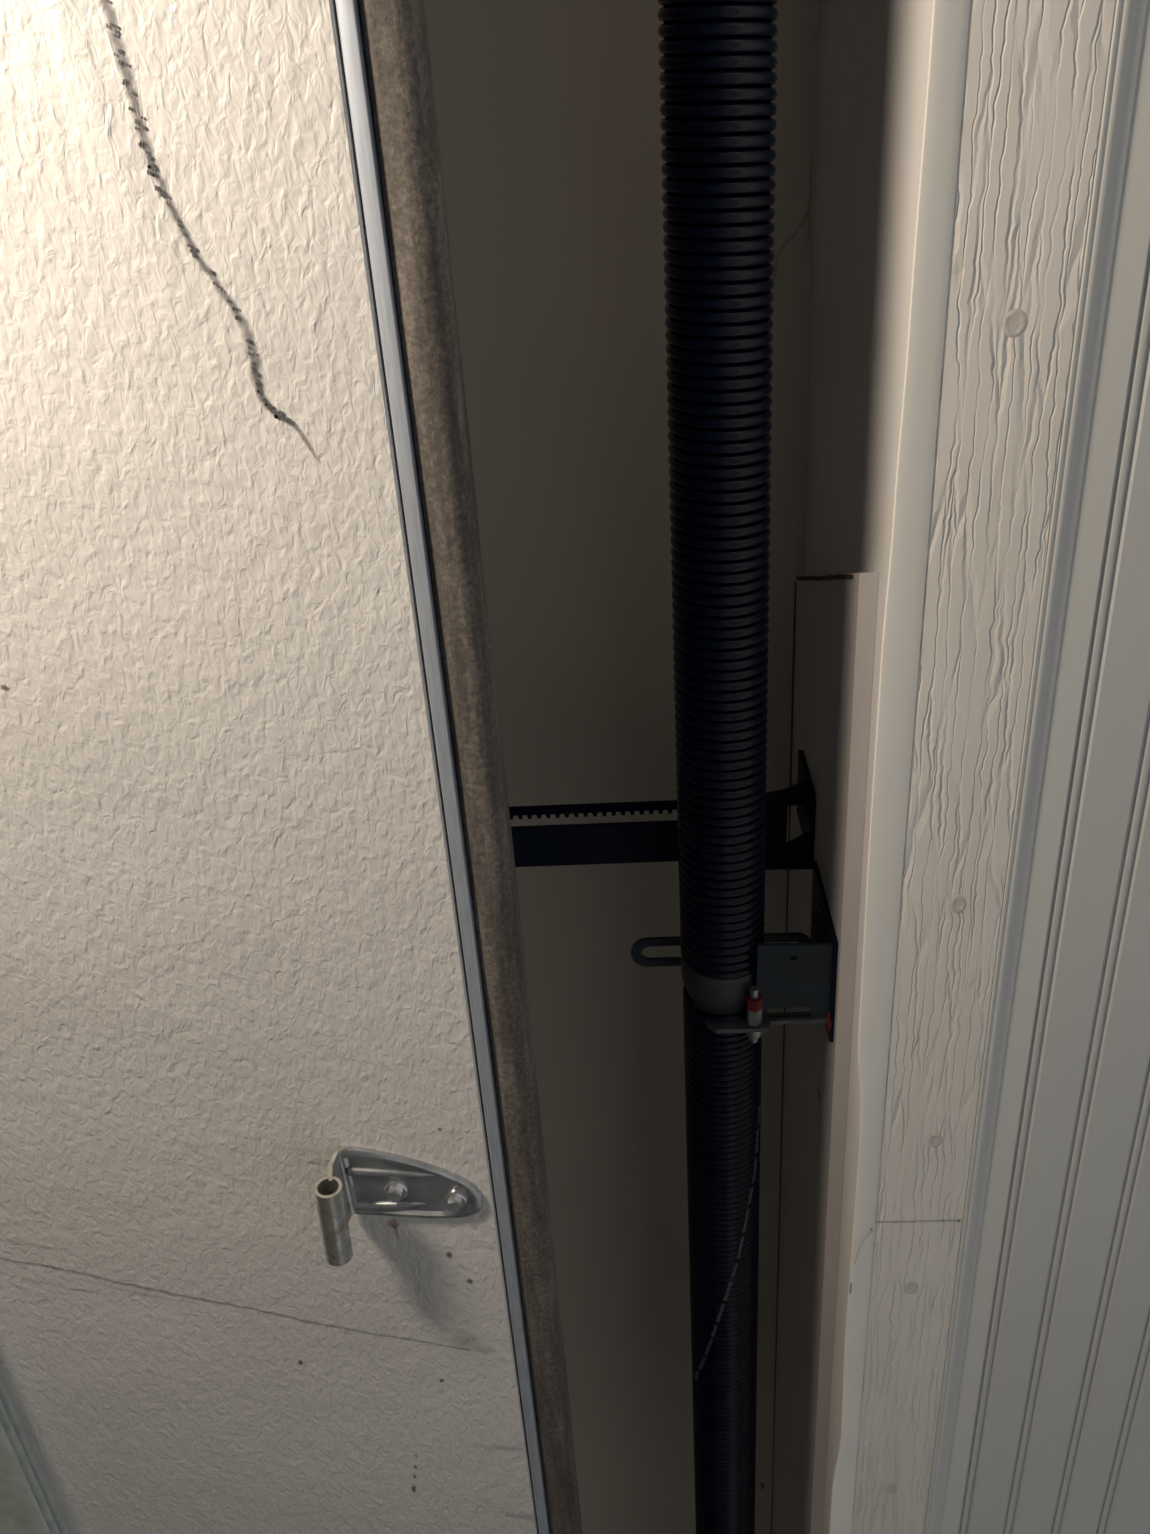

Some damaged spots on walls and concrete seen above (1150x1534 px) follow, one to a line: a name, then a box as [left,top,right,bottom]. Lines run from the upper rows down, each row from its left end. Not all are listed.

crack [102,0,317,460]